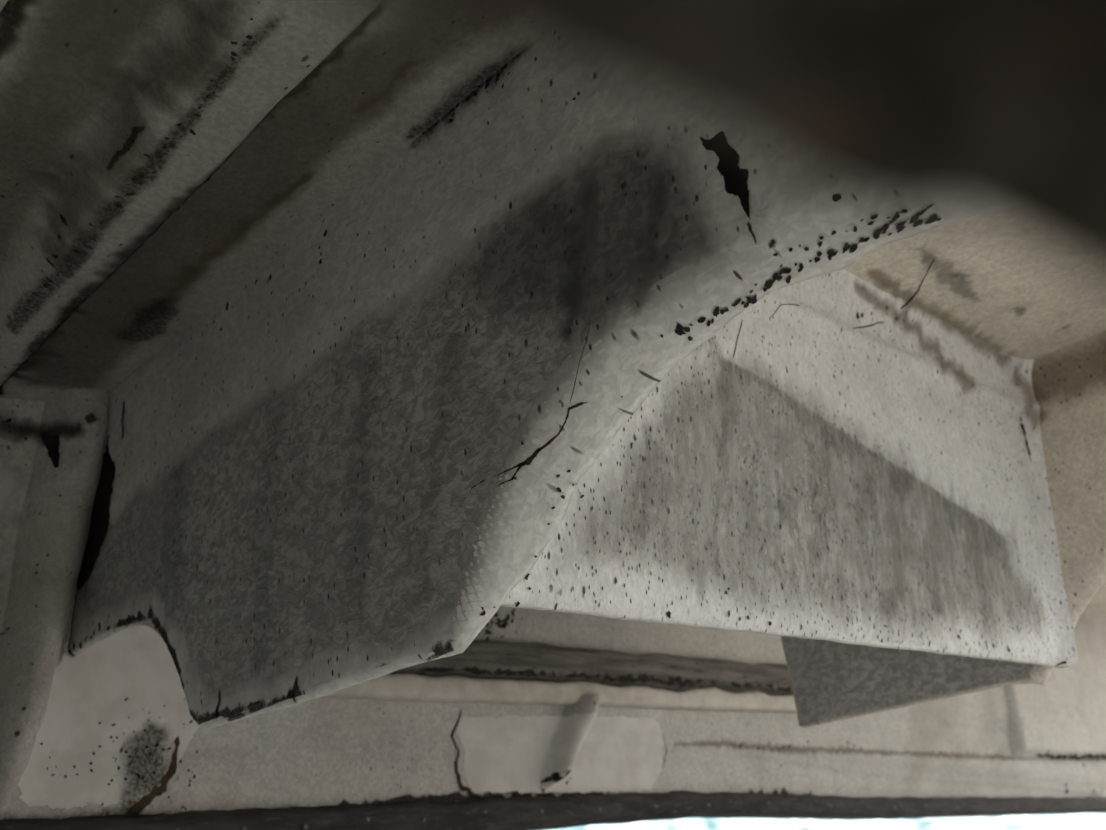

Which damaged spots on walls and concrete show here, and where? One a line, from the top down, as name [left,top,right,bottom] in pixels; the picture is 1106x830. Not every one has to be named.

leakage [0,167,219,395]
leakage [7,19,278,333]
leakage [265,11,380,117]
leakage [407,49,522,147]
spalling [660,131,941,341]
leakage [0,412,99,444]
leakage [47,151,699,816]
crack [470,325,590,492]
leakage [578,345,1055,724]